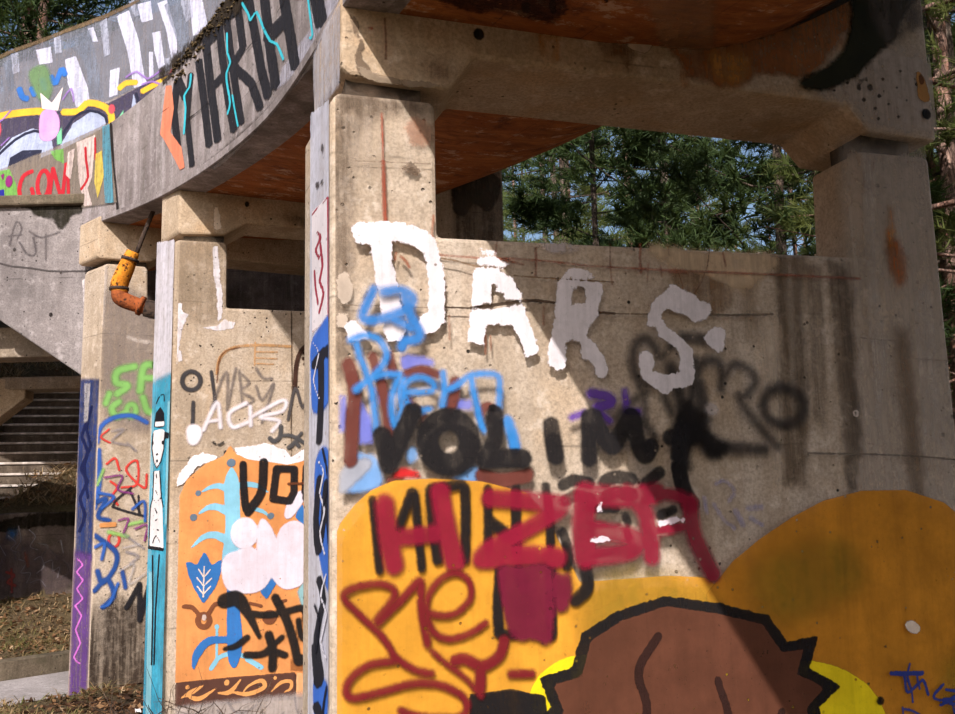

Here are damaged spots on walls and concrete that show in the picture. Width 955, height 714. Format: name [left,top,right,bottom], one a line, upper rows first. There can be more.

rust [670,3,852,88]
water stain [651,245,860,490]